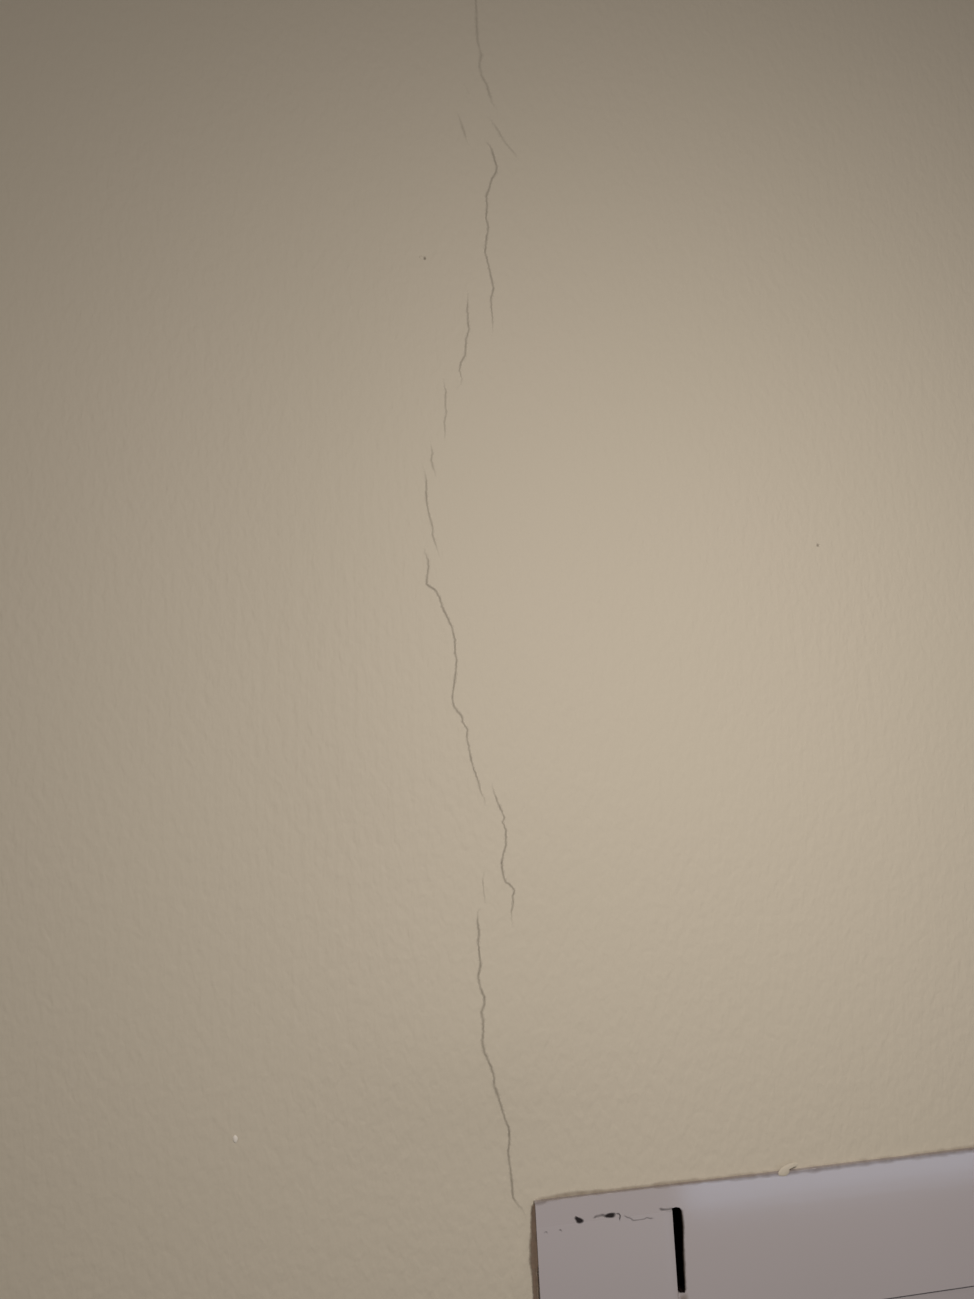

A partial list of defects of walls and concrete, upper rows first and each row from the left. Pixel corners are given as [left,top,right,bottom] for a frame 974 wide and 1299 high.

crack [416,0,539,1299]